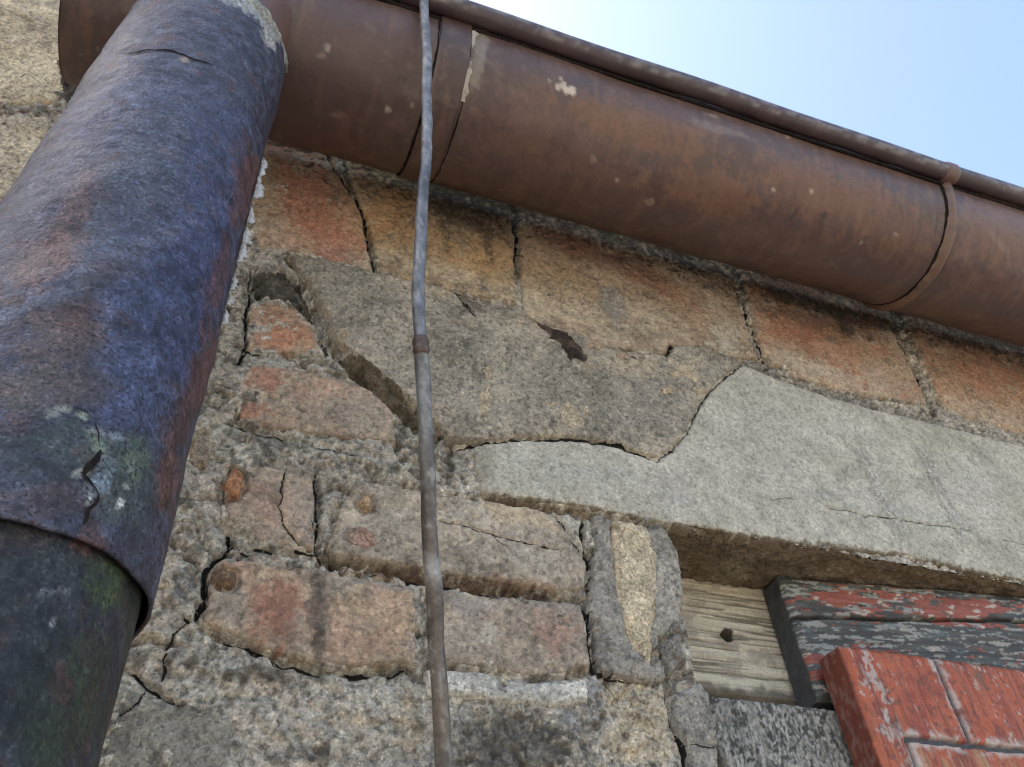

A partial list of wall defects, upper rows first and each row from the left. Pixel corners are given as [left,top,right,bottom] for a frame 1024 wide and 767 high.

crack [326,155,374,273]
crack [511,228,524,275]
crack [236,272,261,365]
spalling [536,322,587,362]
crack [447,303,764,463]
crack [119,471,376,716]
crack [405,582,498,599]
crack [223,643,404,681]